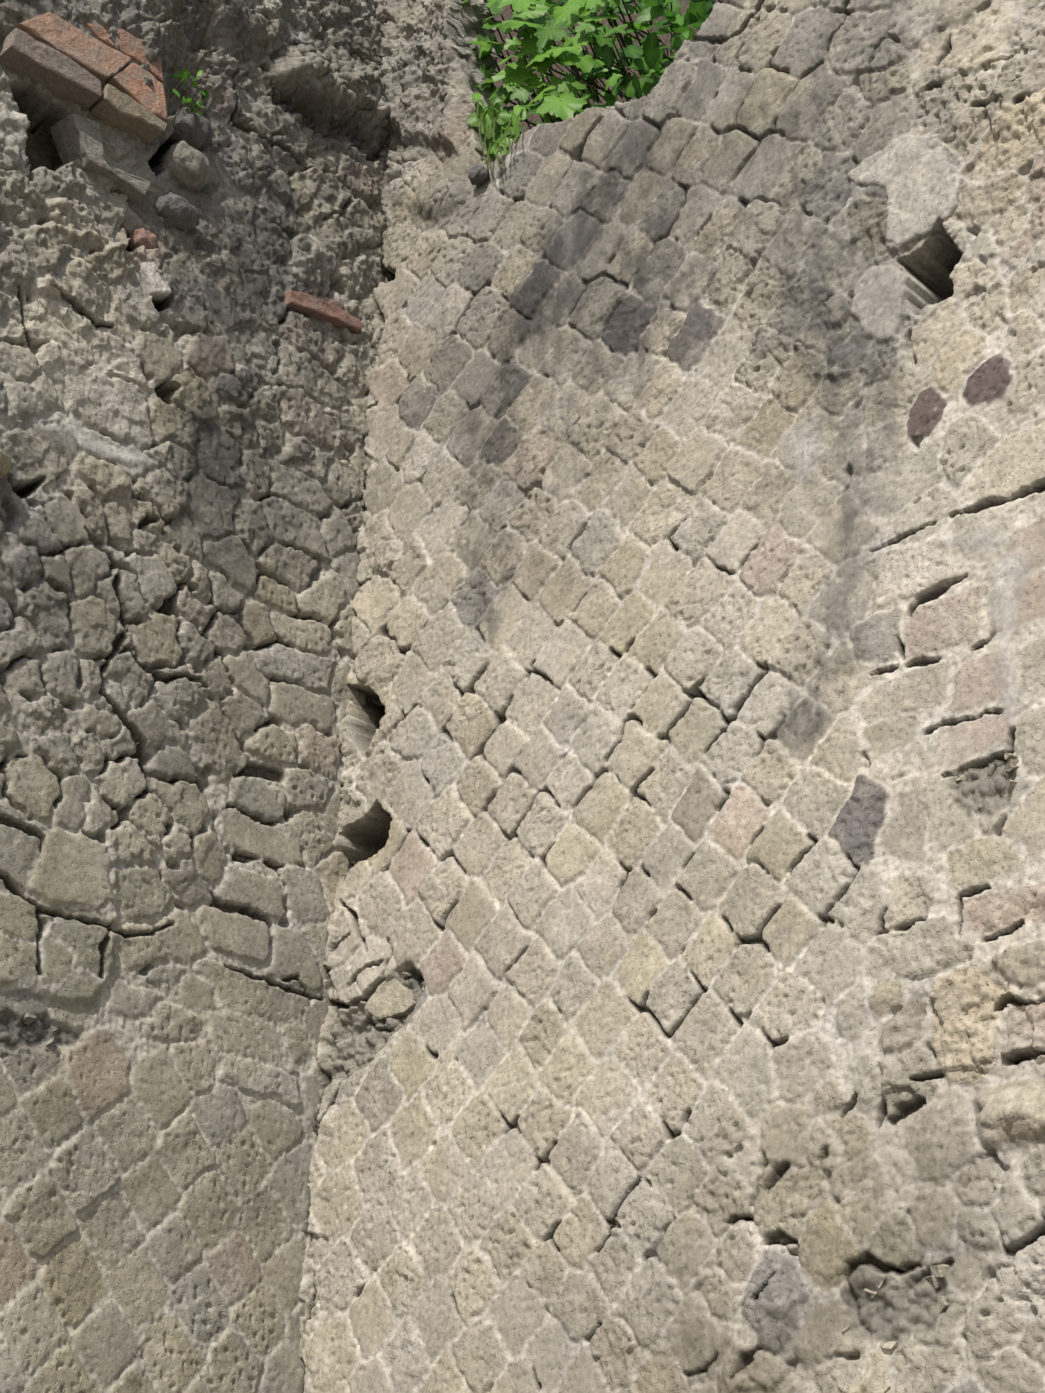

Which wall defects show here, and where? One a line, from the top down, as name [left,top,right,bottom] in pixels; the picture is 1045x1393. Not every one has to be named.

spalling [13,97,63,172]
spalling [148,143,164,169]
spalling [138,262,171,311]
crack [874,583,957,675]
crack [99,560,219,829]
crack [226,765,289,825]
crack [0,876,171,977]
crack [209,898,270,932]
crack [729,912,777,951]
crack [630,1001,674,1038]
crack [1012,1053,1045,1064]
crack [882,1076,944,1124]